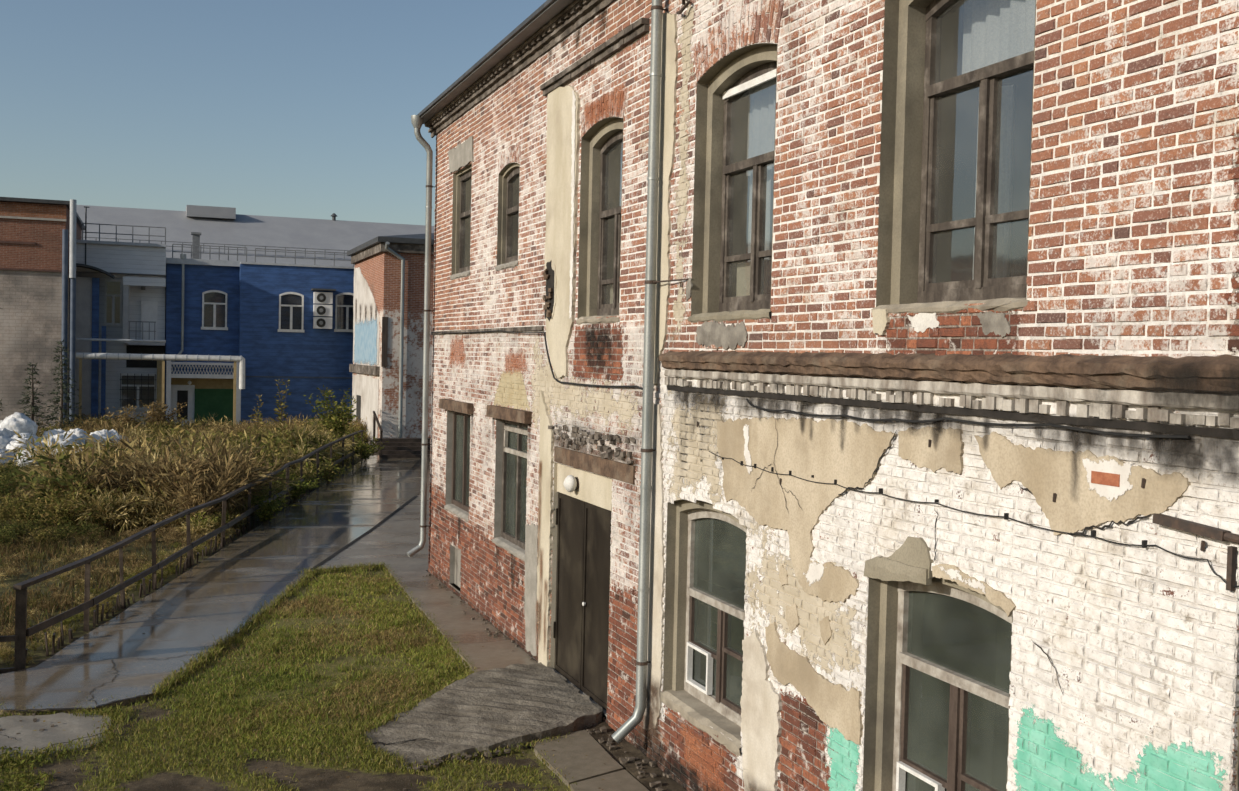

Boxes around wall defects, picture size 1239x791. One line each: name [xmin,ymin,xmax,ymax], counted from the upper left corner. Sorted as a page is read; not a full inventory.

leakage [741,396,809,430]
flaking render [428,2,1191,791]
leakage [831,403,959,443]
leakage [1057,425,1137,469]
leakage [1152,427,1237,478]
leakage [1151,367,1239,410]
crack [0,653,197,755]
peeling [1013,704,1228,791]